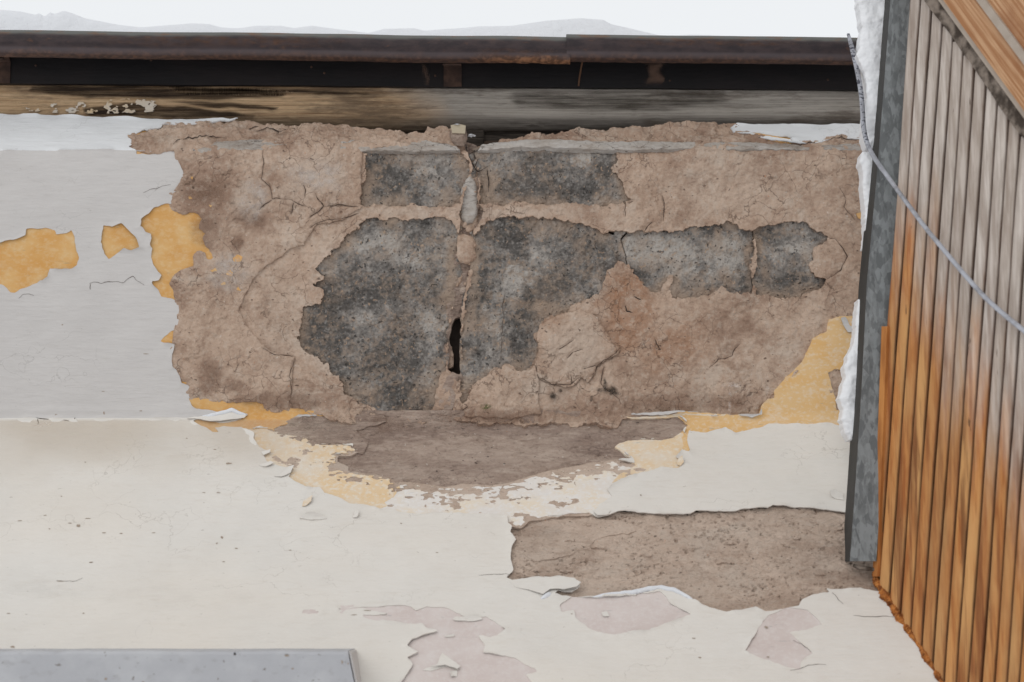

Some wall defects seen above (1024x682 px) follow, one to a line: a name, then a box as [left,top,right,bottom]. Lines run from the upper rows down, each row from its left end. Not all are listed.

peeling [25,98,157,114]
crack [249,126,359,228]
crack [465,144,489,192]
peeling [0,228,79,293]
flaking render [101,120,878,670]
peeling [339,605,537,682]